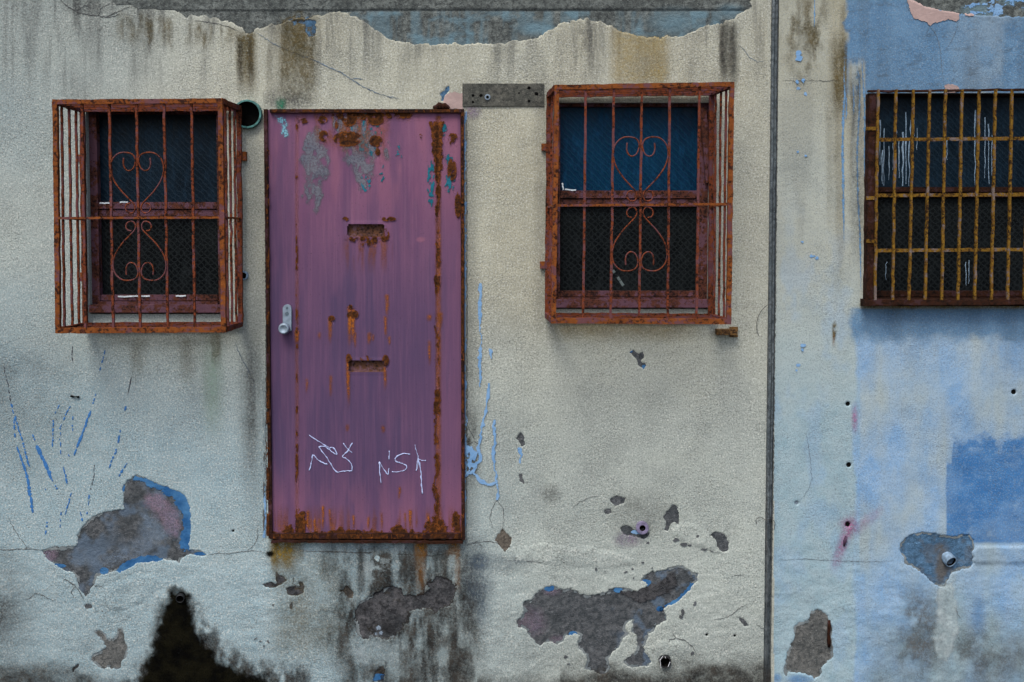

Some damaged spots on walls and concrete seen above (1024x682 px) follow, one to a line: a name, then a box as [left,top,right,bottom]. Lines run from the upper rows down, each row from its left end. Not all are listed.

spalling [112,0,752,45]
spalling [907,0,1024,26]
corrosion [266,109,464,564]
spalling [43,475,206,609]
spalling [900,532,974,587]
spalling [91,628,128,670]
damp [127,586,307,682]
spalling [340,576,457,640]
damp [328,543,489,682]
spalling [517,562,698,674]
damp [560,665,771,682]
spalling [784,609,834,679]